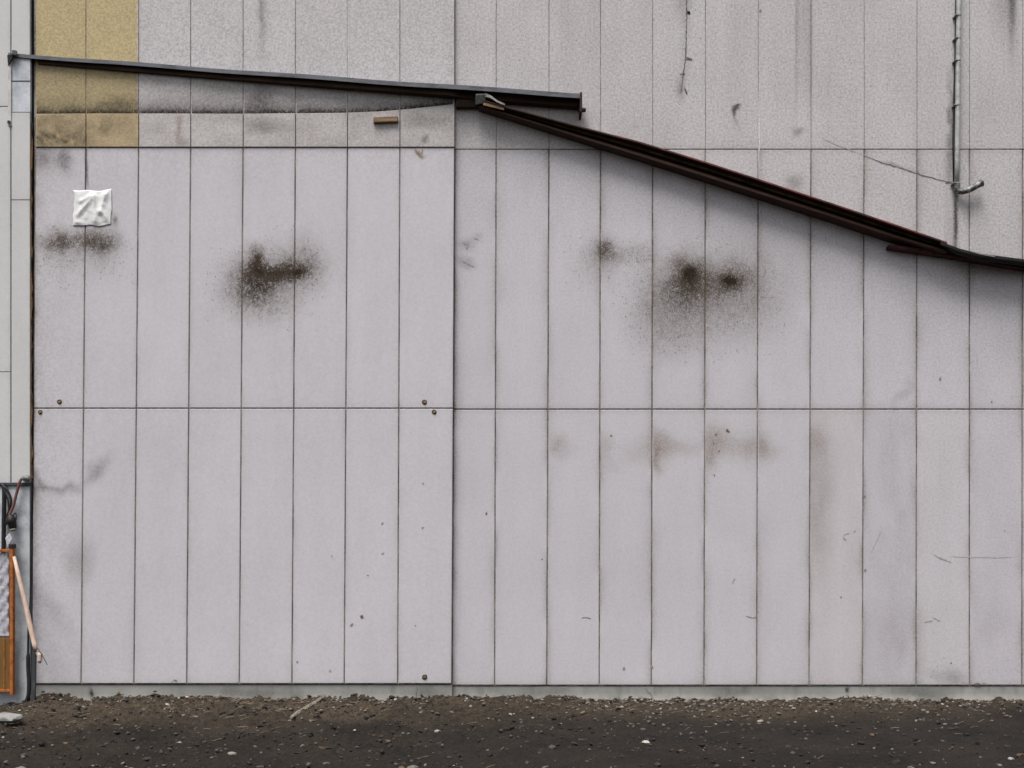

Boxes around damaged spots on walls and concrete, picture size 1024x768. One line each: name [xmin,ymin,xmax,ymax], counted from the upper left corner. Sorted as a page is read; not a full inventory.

crack [680,0,692,94]